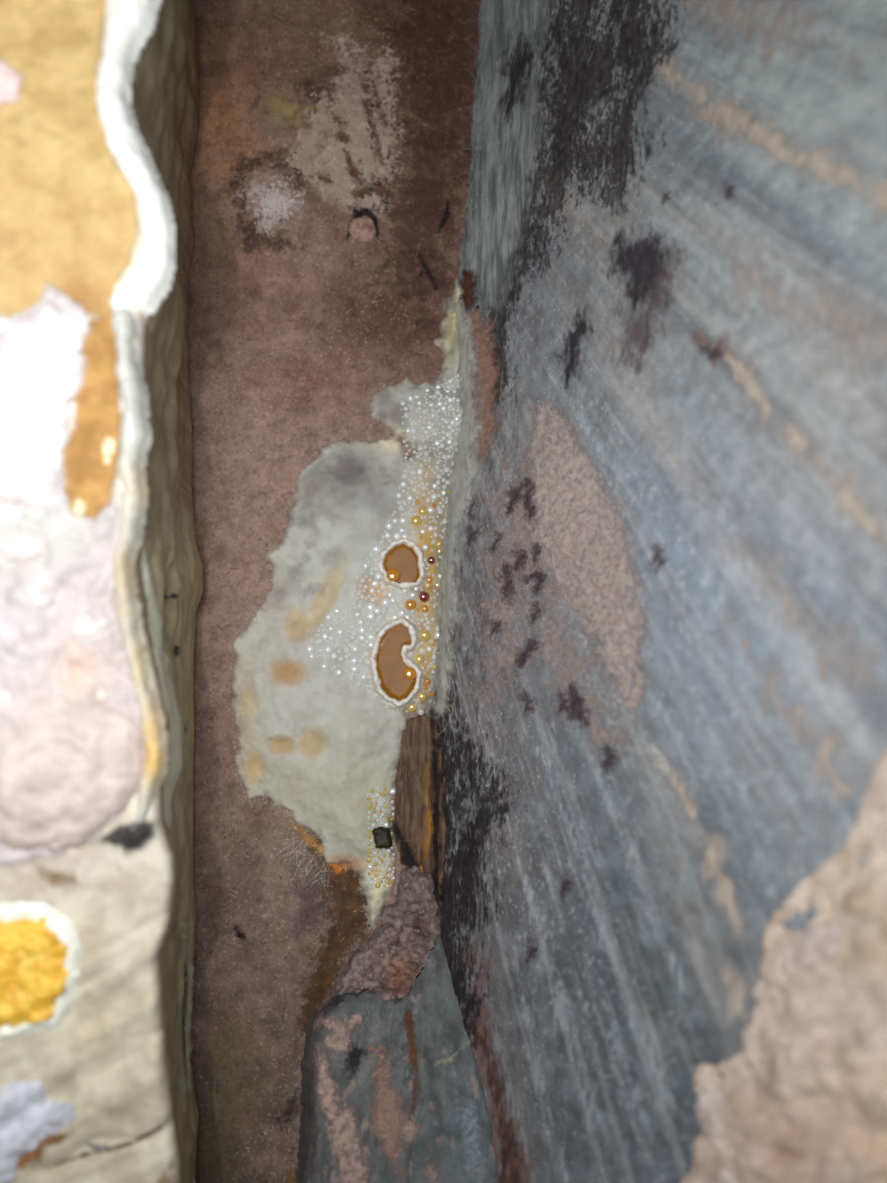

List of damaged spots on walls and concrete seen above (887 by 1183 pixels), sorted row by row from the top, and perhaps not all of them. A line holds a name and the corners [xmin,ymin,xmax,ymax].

leakage [481,0,887,406]
peeling [0,0,182,828]
leakage [507,477,537,520]
leakage [501,544,545,620]
leakage [515,639,537,667]
leakage [558,683,590,727]
leakage [588,745,616,768]
rust [291,822,370,1032]
spalling [680,748,887,1183]